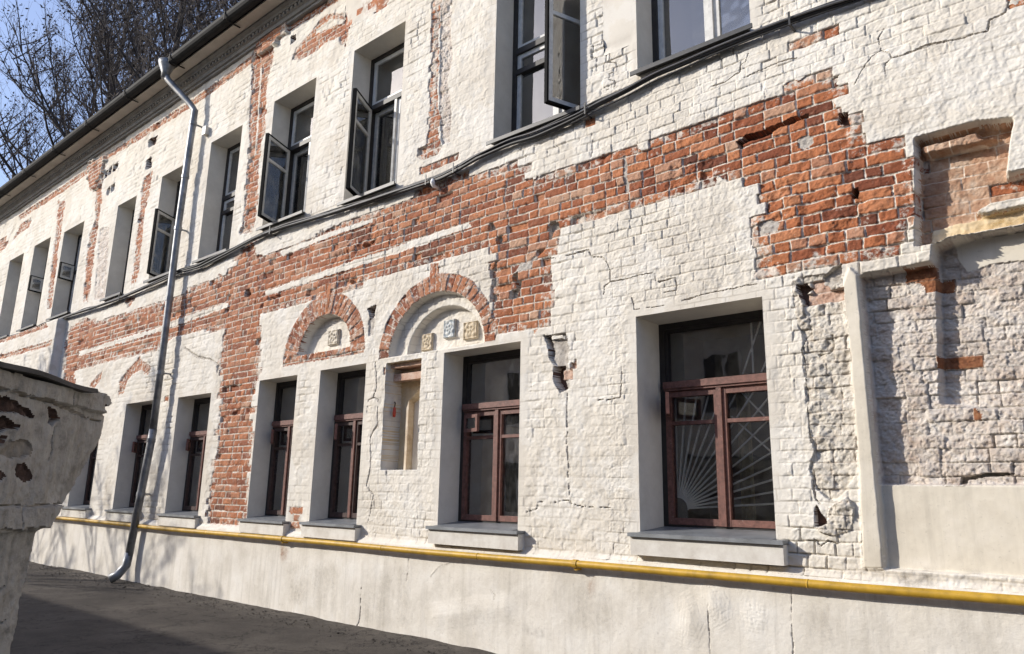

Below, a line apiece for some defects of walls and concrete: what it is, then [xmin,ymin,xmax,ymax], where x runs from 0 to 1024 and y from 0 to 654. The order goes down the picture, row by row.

crack [854,0,1011,85]
peeling [988,173,1024,197]
peeling [0,0,956,529]
crack [489,221,757,310]
crack [527,392,611,513]